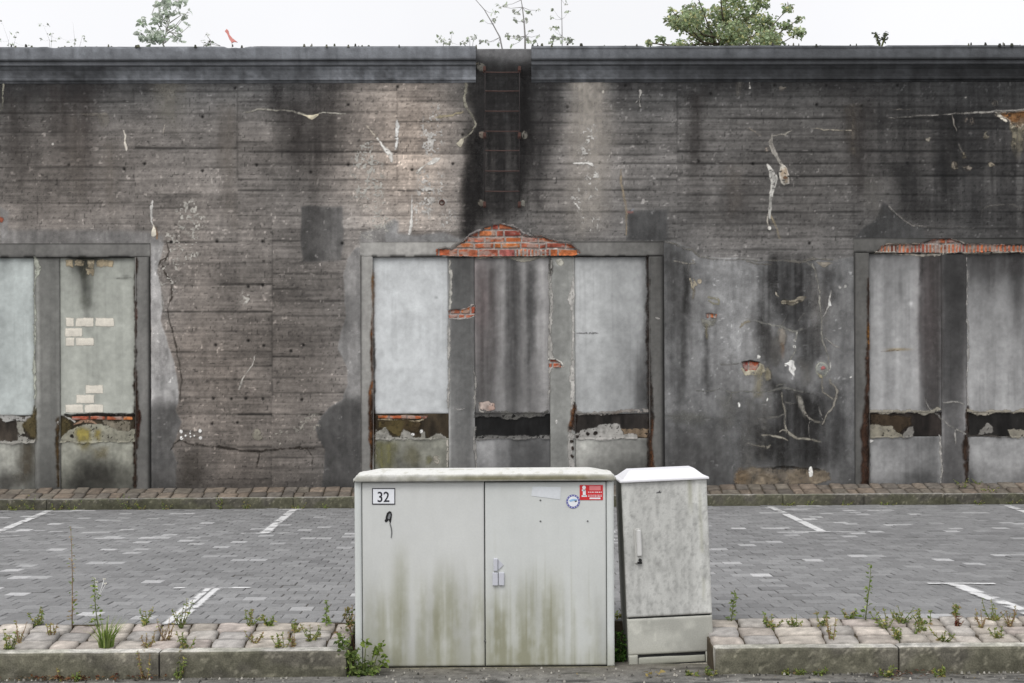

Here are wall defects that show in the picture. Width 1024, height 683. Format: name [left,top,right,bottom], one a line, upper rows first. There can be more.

water stain [463,67,553,234]
spalling [765,131,790,232]
peeling [57,385,135,444]
crack [159,243,182,395]
crack [170,439,314,467]
spalling [436,223,649,468]
crack [707,257,839,449]
water stain [747,372,837,468]
water stain [768,258,828,361]
rust [860,278,870,484]
peeling [870,407,941,443]
spalling [874,239,1024,439]